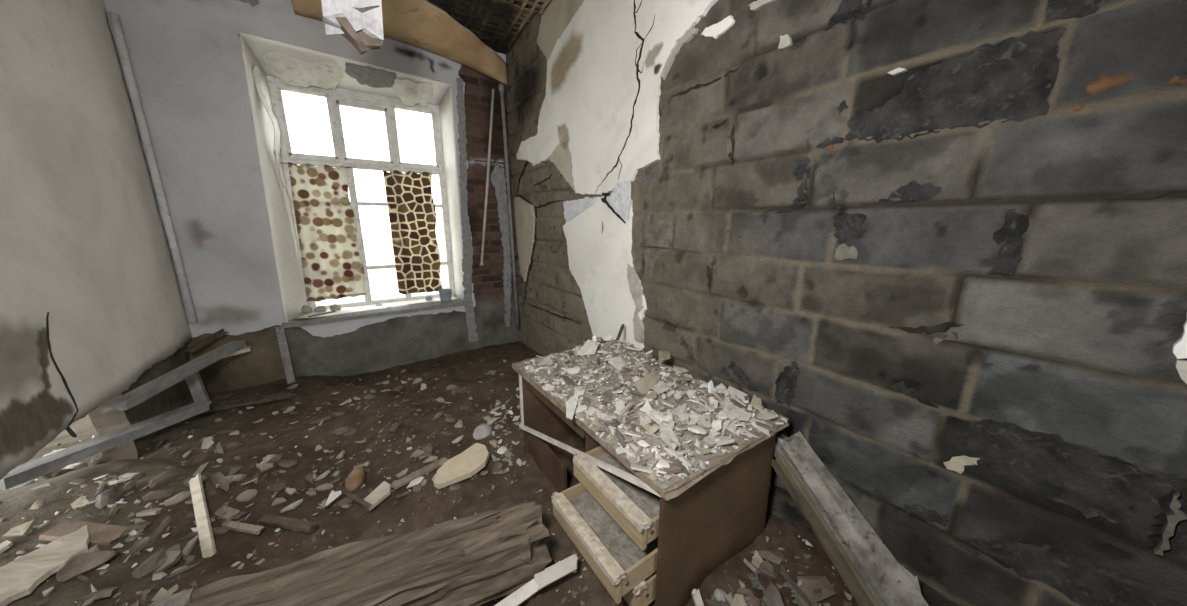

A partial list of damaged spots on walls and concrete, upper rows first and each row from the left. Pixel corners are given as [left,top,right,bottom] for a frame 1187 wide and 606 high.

peeling [490,165,536,327]
crack [516,161,578,322]
peeling [516,0,718,350]
crack [596,0,655,231]
spalling [832,191,866,260]
spalling [790,0,1109,206]
spalling [987,209,1029,276]
leakage [0,328,73,460]
spalling [775,361,800,408]
spalling [933,326,965,345]
spalling [943,419,1187,544]
spalling [897,504,1185,606]